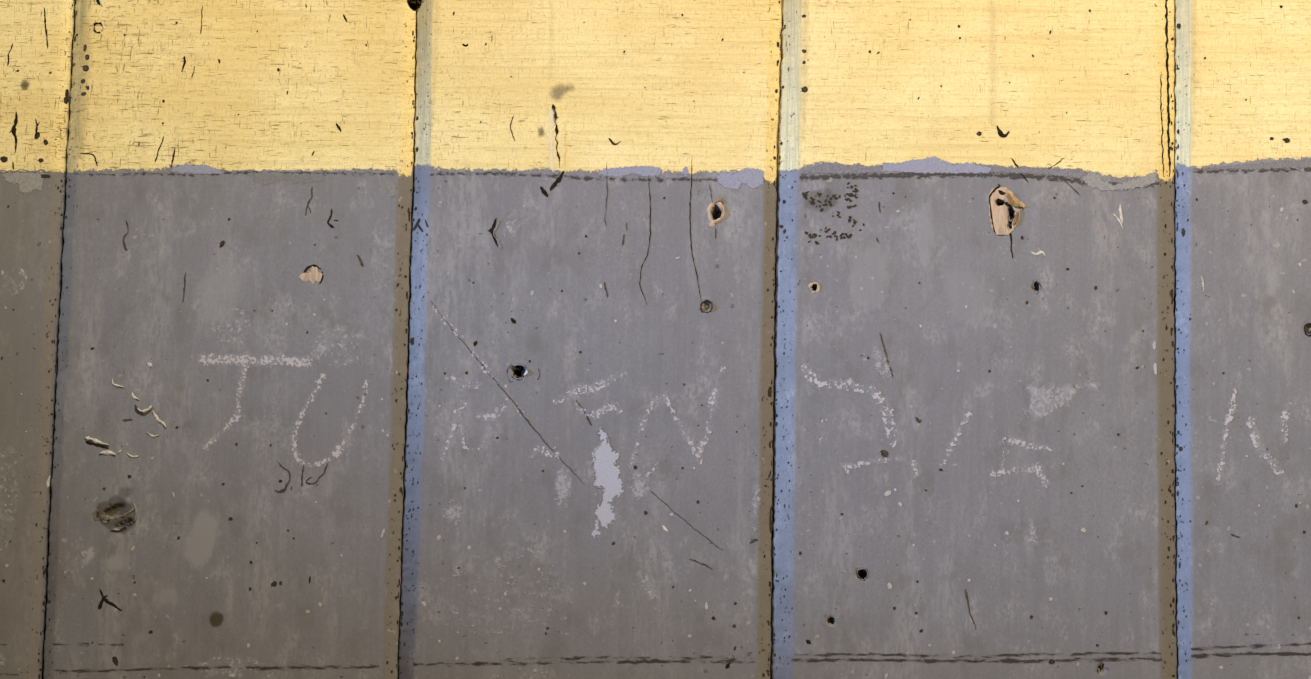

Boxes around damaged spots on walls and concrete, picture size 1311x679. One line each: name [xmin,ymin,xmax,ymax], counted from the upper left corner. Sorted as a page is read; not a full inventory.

peeling [802,156,1159,245]
peeling [591,427,637,545]